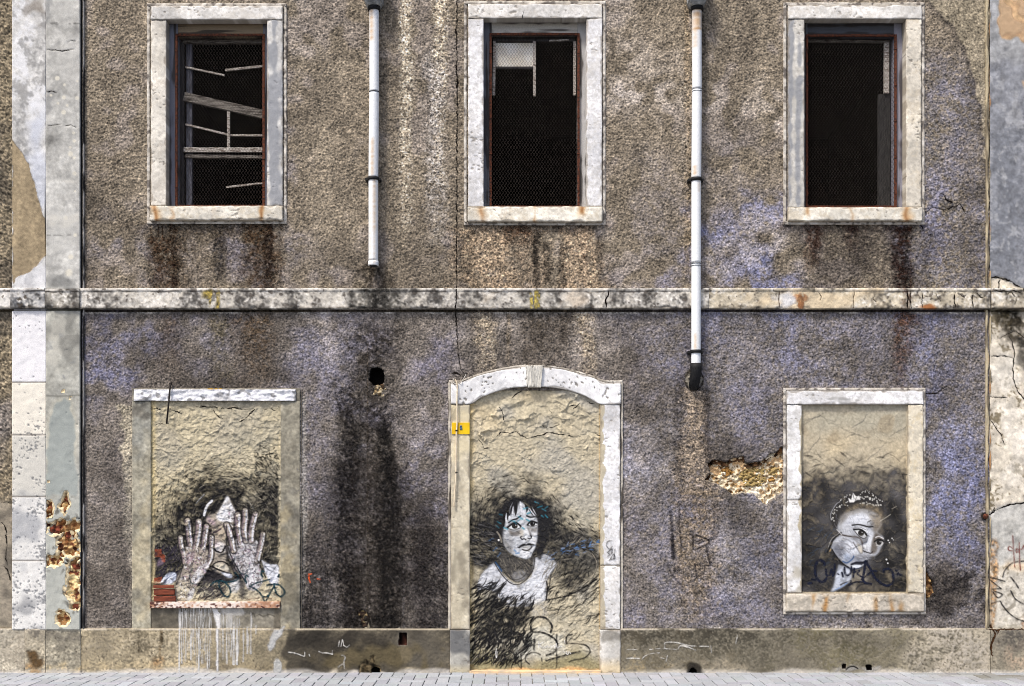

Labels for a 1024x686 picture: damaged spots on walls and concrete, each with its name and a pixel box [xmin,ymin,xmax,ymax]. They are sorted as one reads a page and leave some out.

peeling [12,140,46,283]
crack [448,1,468,383]
damp [350,267,397,309]
corrosion [891,227,914,352]
hole [363,367,386,407]
crack [991,331,1024,443]
damp [300,329,448,628]
flaking render [705,447,783,504]
flaking render [46,490,81,627]